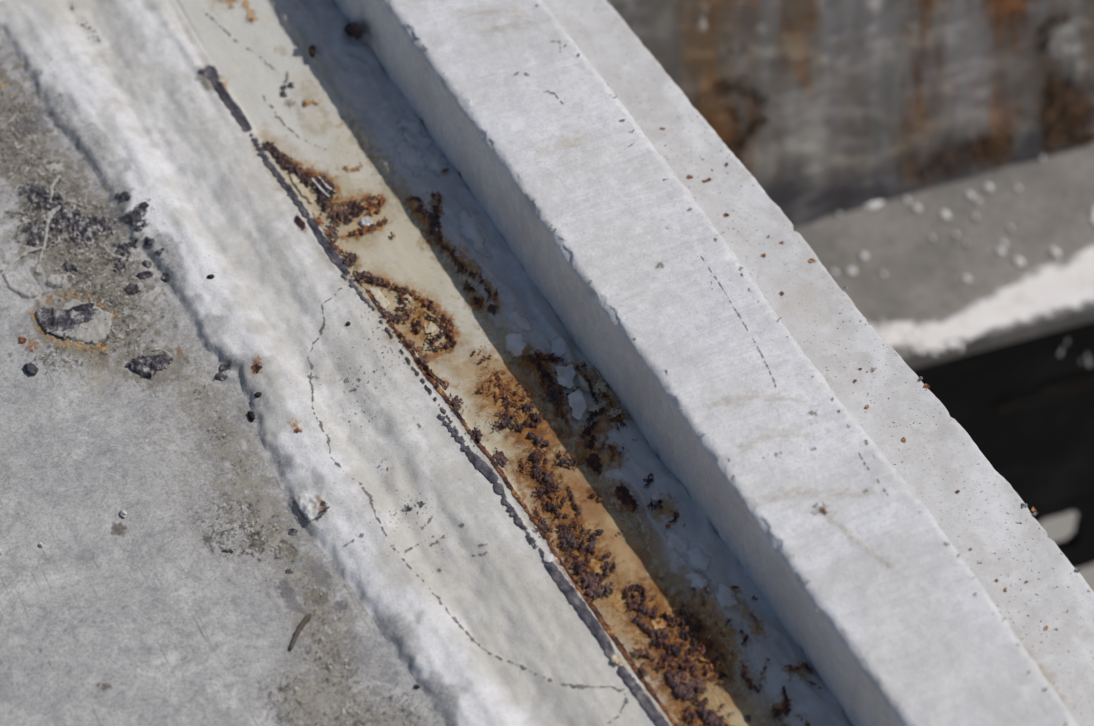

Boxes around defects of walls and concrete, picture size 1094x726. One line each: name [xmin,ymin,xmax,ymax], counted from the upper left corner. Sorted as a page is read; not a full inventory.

corrosion [227,0,257,21]
damp [179,356,428,726]
crack [308,288,628,723]
corrosion [263,120,787,726]
damp [871,246,1094,355]